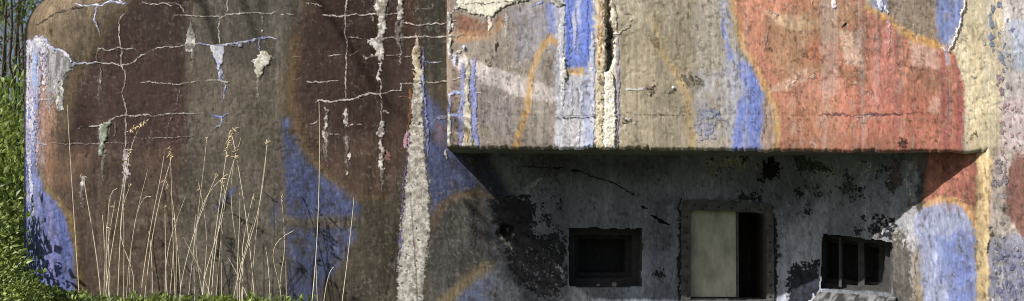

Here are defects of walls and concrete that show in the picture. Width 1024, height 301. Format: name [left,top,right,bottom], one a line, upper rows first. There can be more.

crack [37,0,464,145]
leakage [363,0,404,81]
peeling [447,0,528,59]
crack [553,0,691,148]
peeling [24,35,74,230]
leakage [376,108,391,190]
leakage [792,138,924,221]